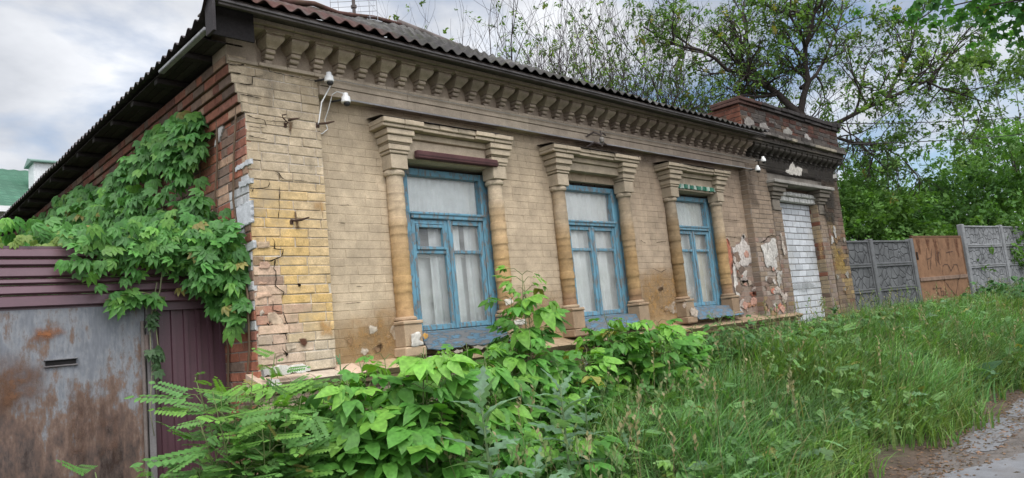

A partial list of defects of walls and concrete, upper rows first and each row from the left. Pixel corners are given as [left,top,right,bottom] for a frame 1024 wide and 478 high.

peeling [235,158,254,188]
flaking render [785,162,803,176]
peeling [236,200,255,230]
crack [252,171,301,356]
flaking render [726,233,788,313]